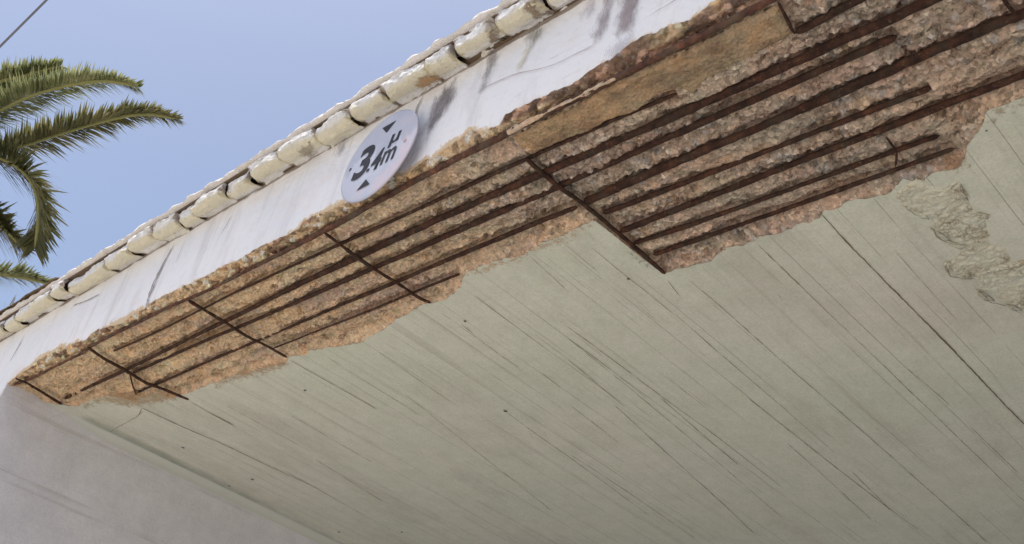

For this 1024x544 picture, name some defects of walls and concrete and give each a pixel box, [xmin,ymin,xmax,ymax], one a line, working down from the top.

corrosion [524,1,547,19]
corrosion [483,18,510,43]
corrosion [416,76,440,88]
spalling [8,0,1024,406]